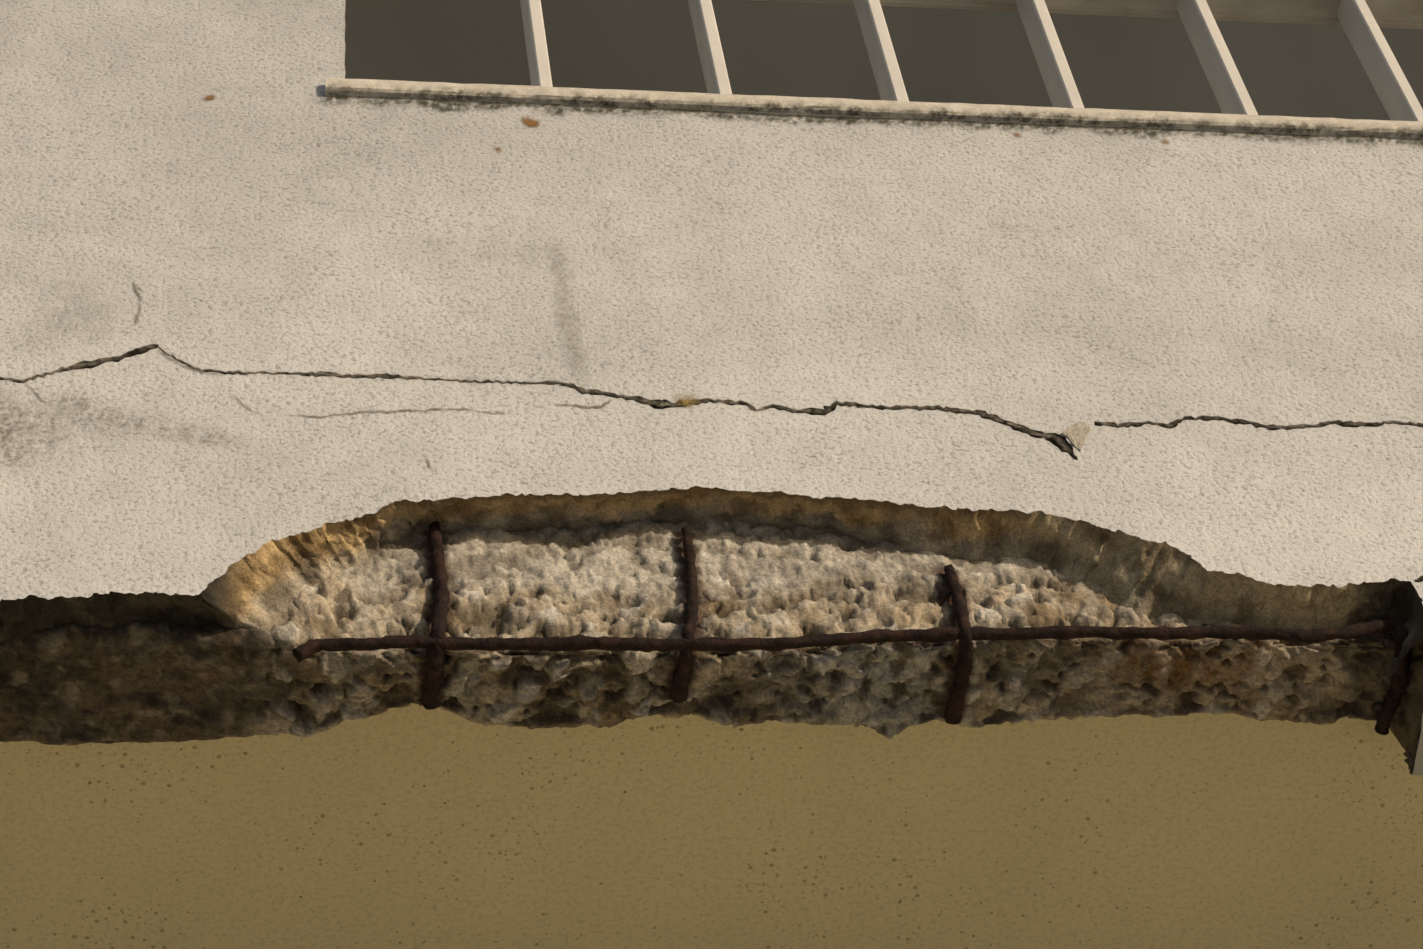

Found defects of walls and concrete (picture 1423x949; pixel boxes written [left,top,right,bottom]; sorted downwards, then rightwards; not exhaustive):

leakage [326,85,1423,146]
crack [0,284,1423,460]
spalling [0,486,1423,775]